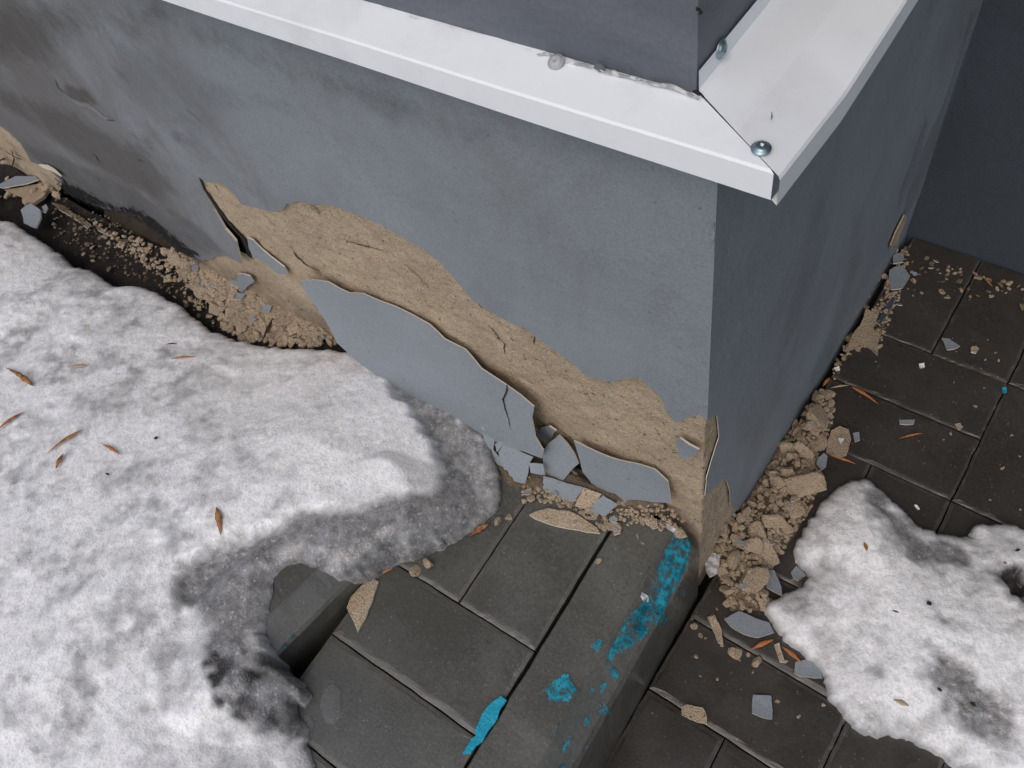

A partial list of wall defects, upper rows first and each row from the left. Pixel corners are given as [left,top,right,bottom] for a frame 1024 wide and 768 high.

spalling [0,126,62,229]
spalling [104,178,737,585]